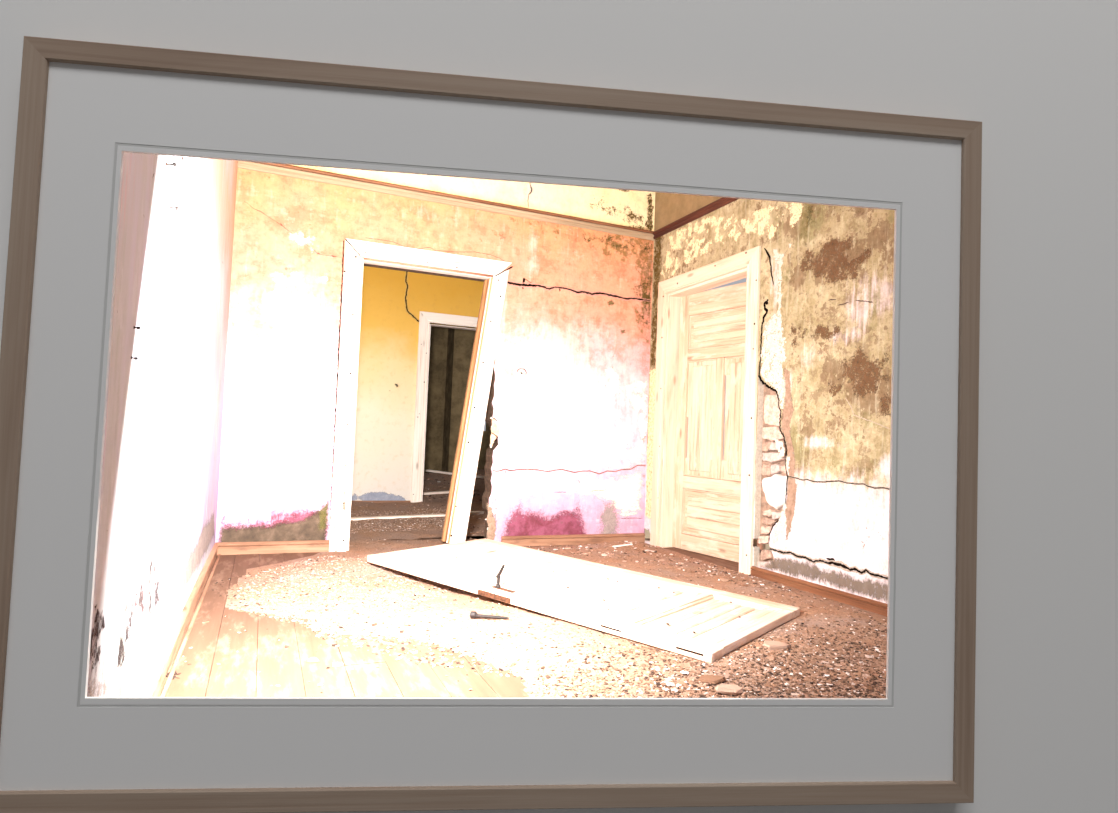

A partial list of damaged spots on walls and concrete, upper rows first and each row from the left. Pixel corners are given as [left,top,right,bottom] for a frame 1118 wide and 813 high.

peeling [290,232,317,253]
water stain [798,237,872,283]
water stain [790,323,840,347]
crack [244,201,651,519]
flaking render [660,202,803,567]
water stain [828,346,891,418]
peeling [505,369,656,519]
water stain [343,491,405,520]
water stain [505,501,619,536]
crack [769,547,888,580]
water stain [89,510,328,697]